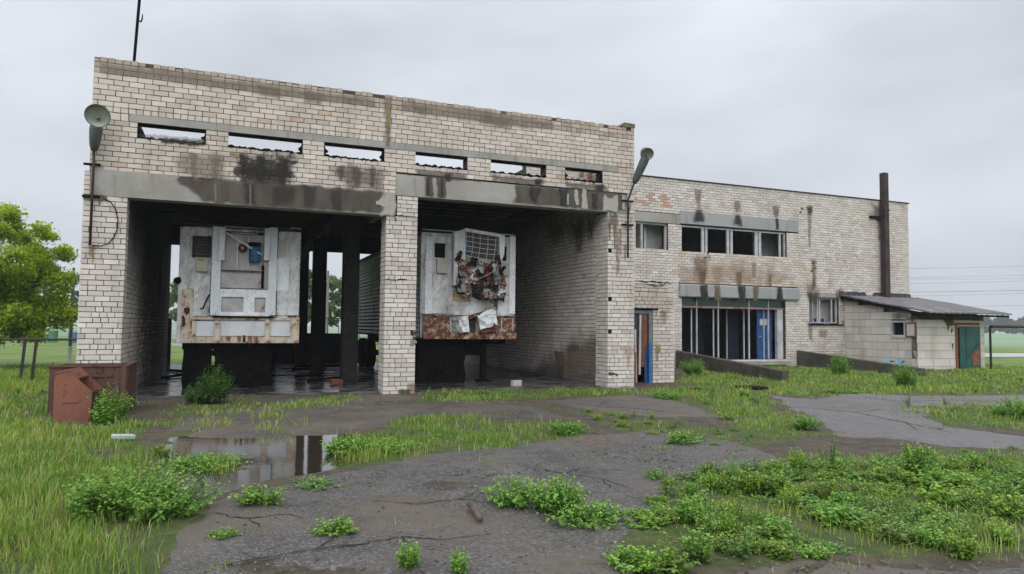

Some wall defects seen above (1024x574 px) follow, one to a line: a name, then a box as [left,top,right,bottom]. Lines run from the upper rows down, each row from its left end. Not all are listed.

damp [178,153,383,213]
damp [425,173,451,197]
damp [515,179,626,210]
damp [700,285,721,301]
damp [738,286,759,301]